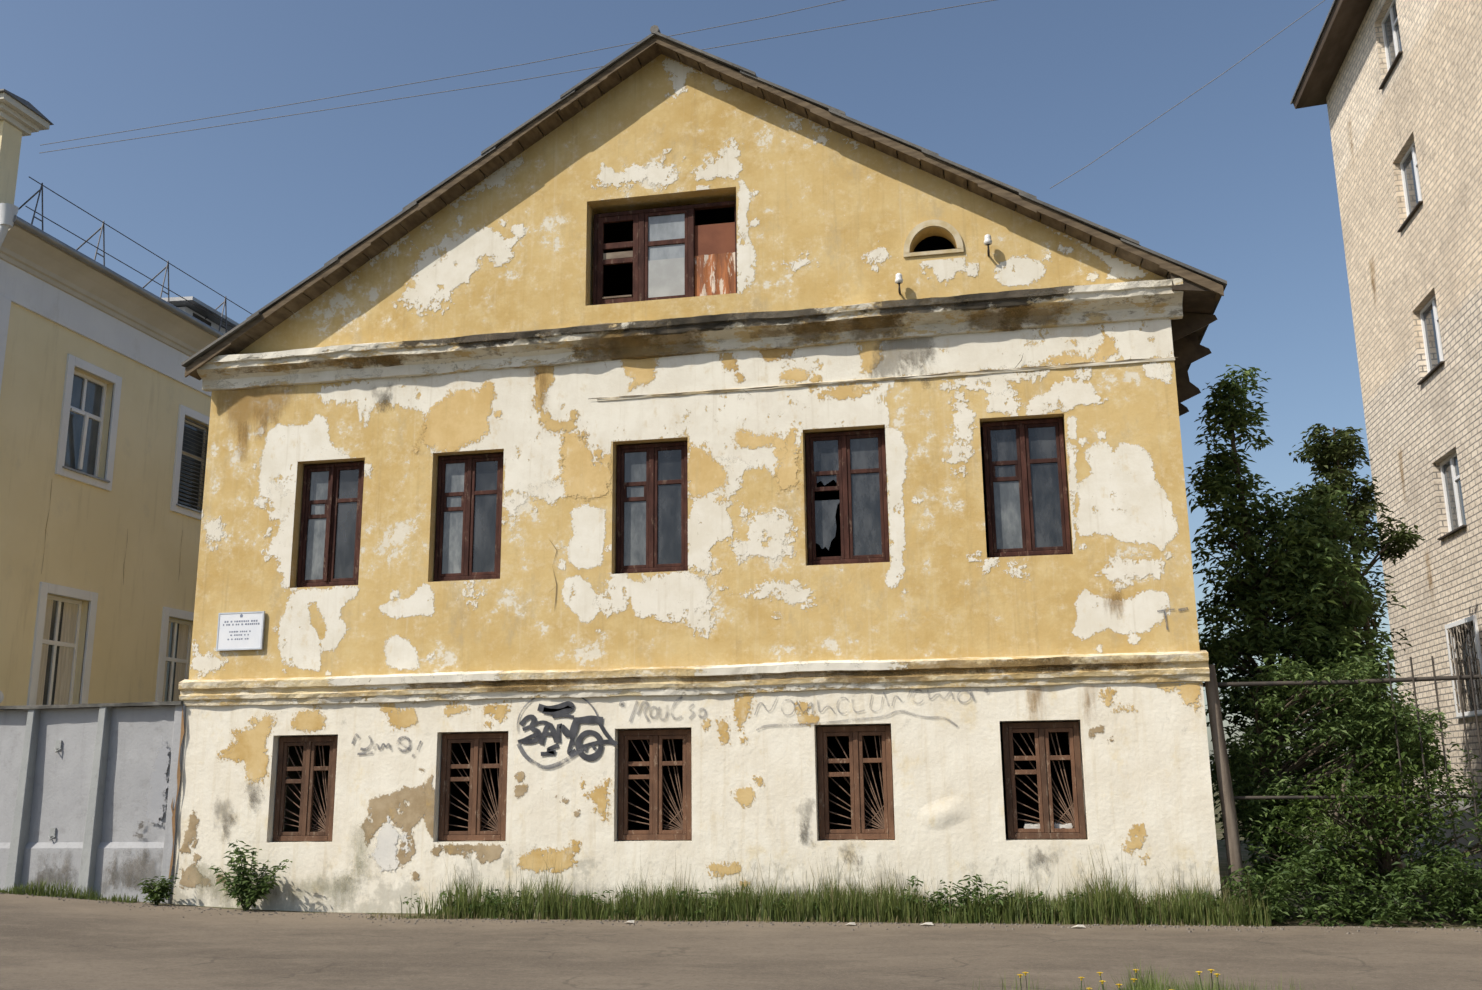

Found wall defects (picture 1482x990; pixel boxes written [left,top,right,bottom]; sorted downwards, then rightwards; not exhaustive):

peeling [353,157,525,317]
peeling [591,136,760,294]
rust [695,252,736,297]
water stain [256,355,400,372]
water stain [451,329,553,350]
water stain [574,313,737,363]
water stain [751,315,901,346]
peeling [214,226,1179,787]
spalling [361,768,582,881]